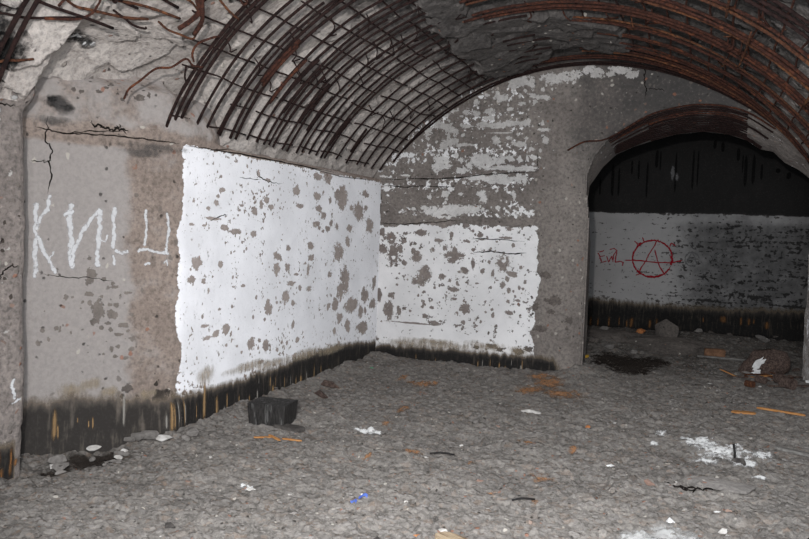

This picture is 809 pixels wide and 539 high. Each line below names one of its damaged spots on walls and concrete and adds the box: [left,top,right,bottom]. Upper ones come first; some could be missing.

crack [31,119,538,225]
crack [474,238,525,255]
water stain [587,297,805,342]
water stain [0,339,558,480]